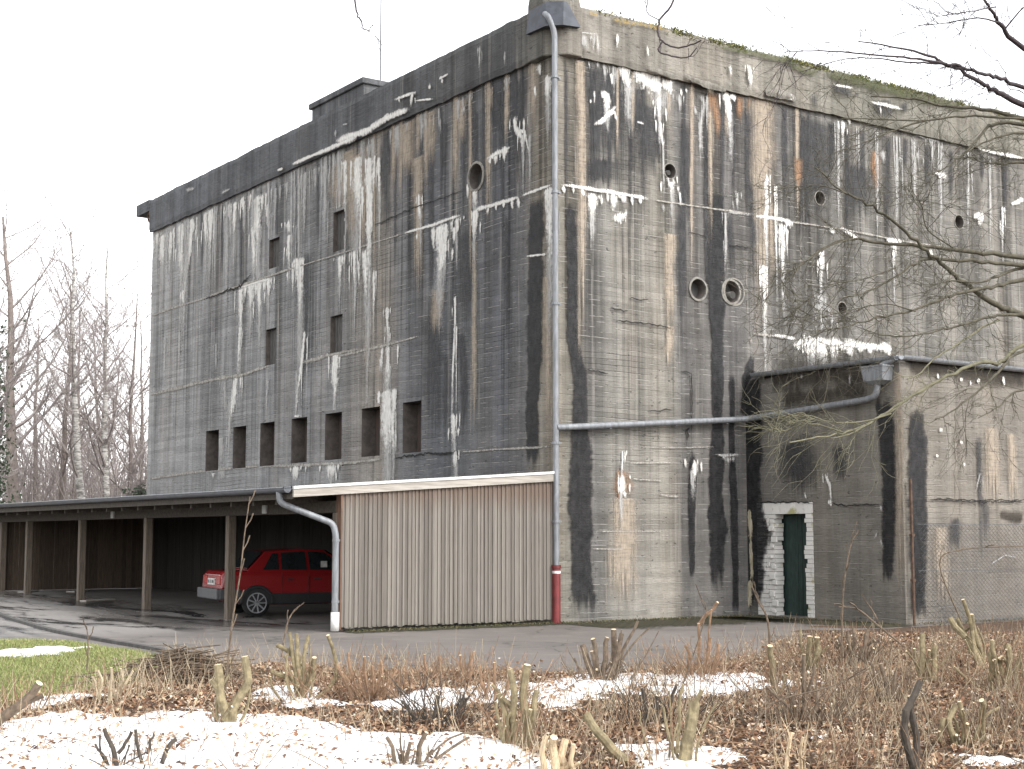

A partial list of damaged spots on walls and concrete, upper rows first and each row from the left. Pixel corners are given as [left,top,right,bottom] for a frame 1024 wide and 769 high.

rust [616,68,634,140]
damp [967,149,1023,248]
damp [153,62,953,615]